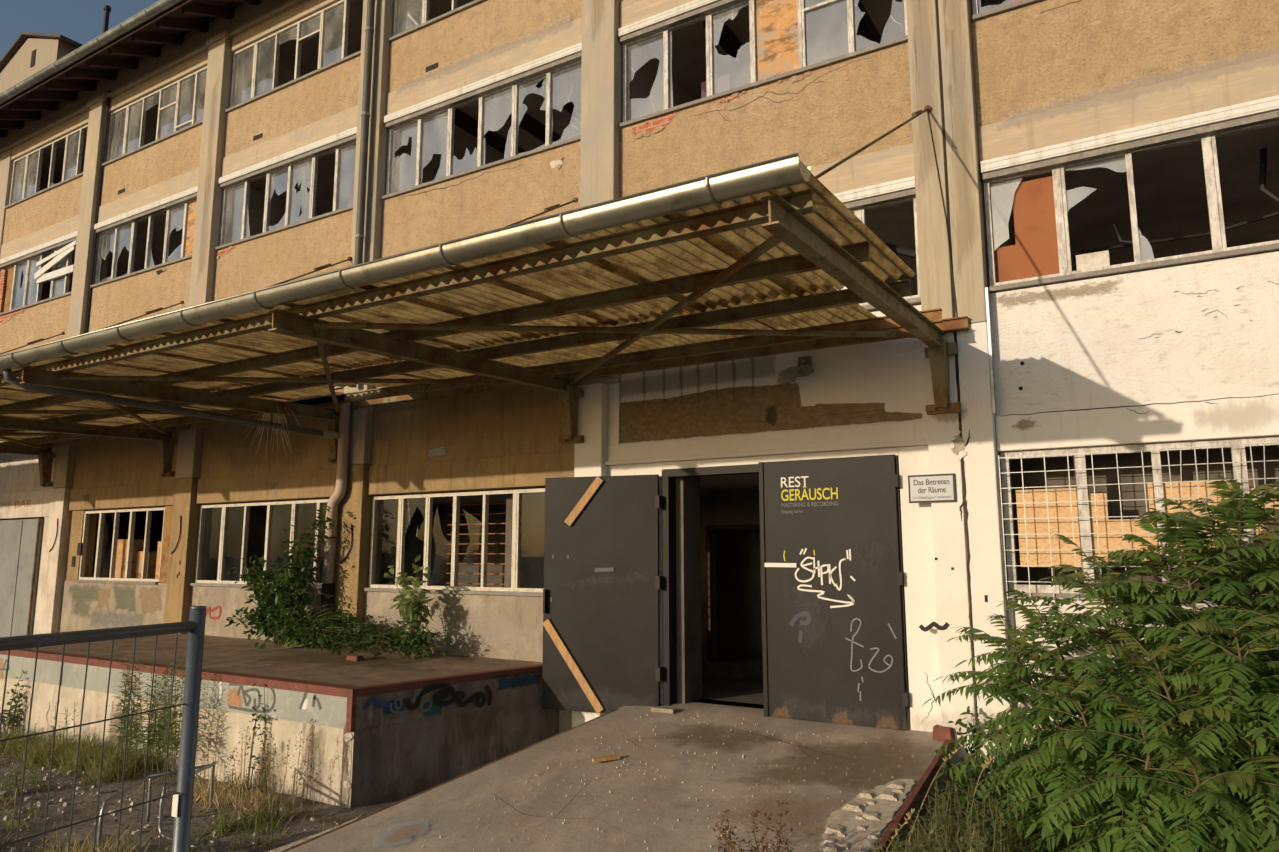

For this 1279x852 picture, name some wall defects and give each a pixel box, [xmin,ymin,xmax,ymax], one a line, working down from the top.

flaking render [631,112,676,139]
peeling [620,384,922,443]